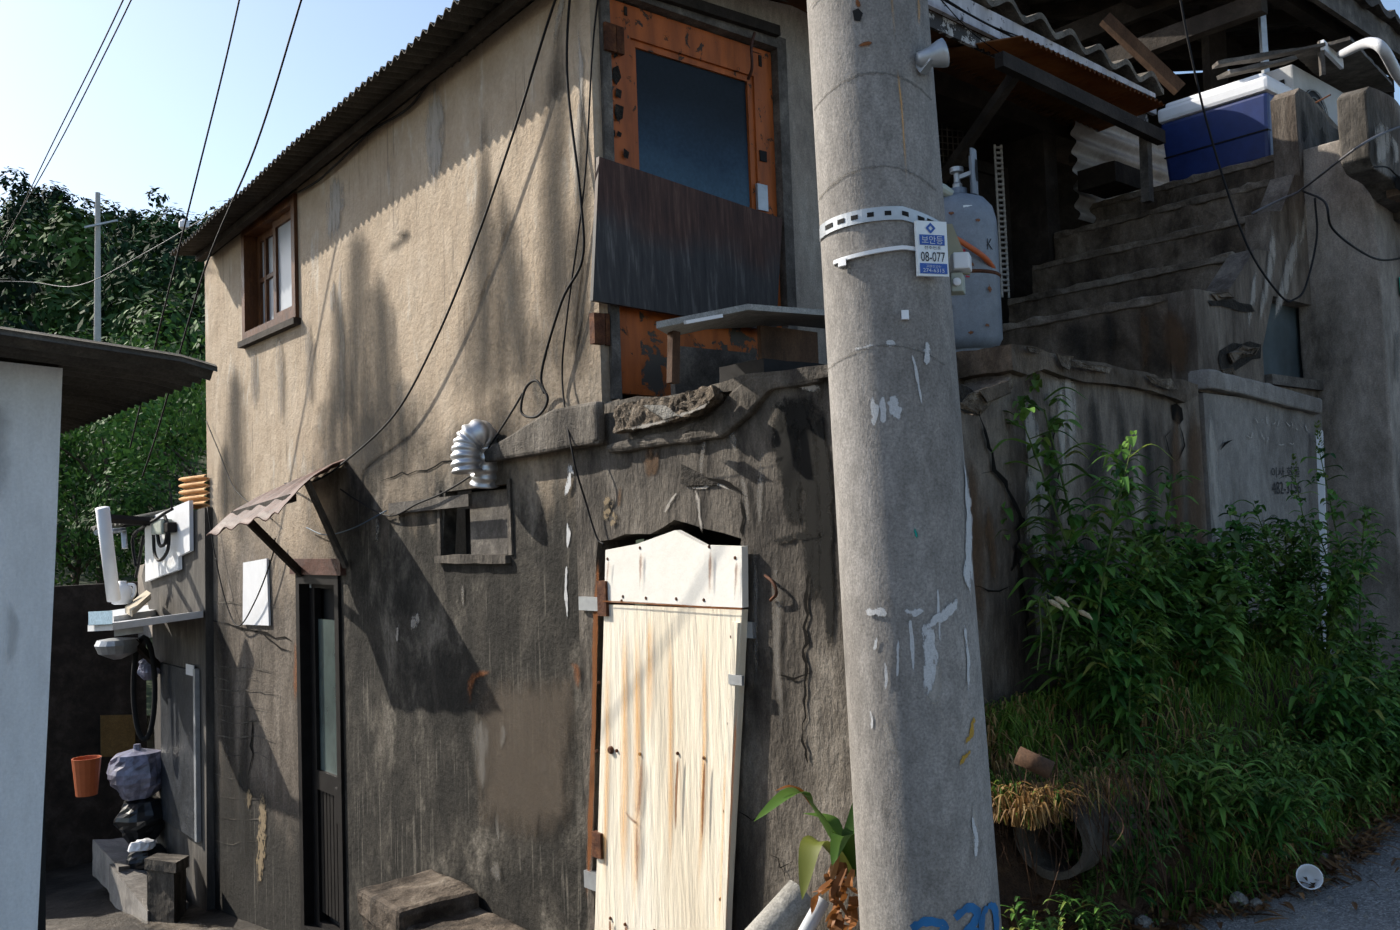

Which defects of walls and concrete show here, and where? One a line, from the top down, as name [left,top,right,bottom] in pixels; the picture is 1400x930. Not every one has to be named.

damp [323,242,402,475]
damp [466,165,531,385]
damp [742,396,834,647]
peeling [247,789,267,881]
damp [476,725,505,783]
rust [573,563,742,889]
crack [775,572,811,763]